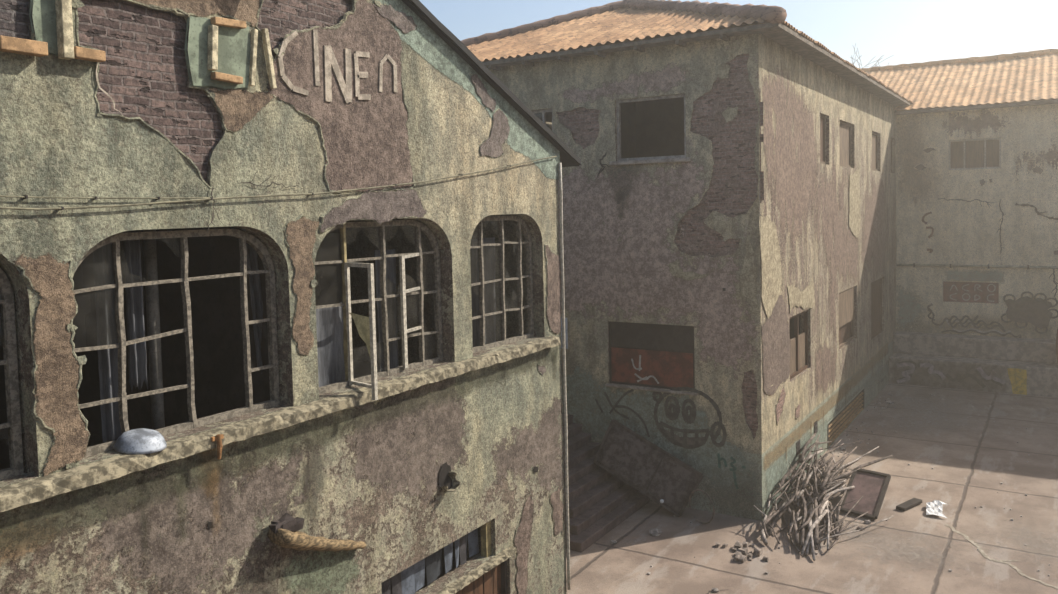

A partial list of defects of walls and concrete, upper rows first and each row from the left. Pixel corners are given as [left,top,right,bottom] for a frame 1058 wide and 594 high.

flaking render [0,0,35,40]
peeling [71,0,888,441]
crack [940,198,1058,254]
flaking render [6,253,90,477]
peeling [81,429,360,594]
peeling [342,376,469,505]
peeling [490,361,889,594]